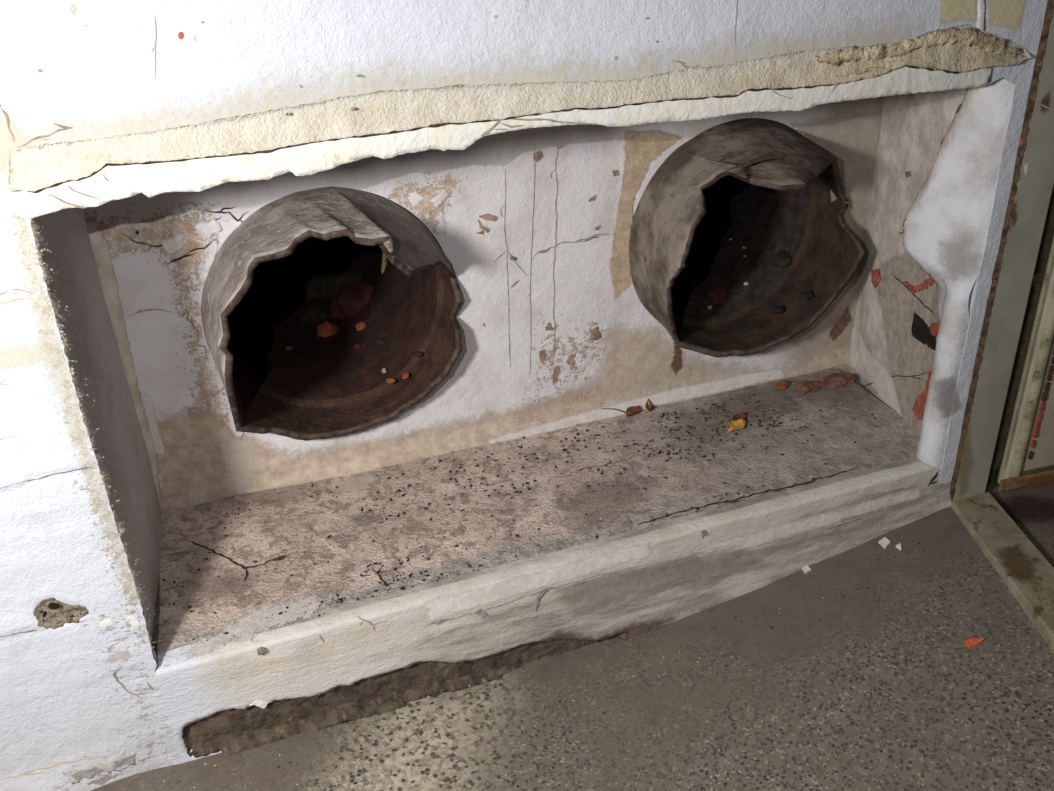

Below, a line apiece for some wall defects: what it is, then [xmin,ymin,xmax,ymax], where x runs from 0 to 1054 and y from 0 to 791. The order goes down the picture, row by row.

crack [0,107,73,147]
spalling [8,66,993,439]
rust [829,306,852,343]
crack [638,469,853,524]
peeling [33,323,175,791]
crack [186,539,294,581]
peeling [534,587,554,611]
spalling [182,630,636,758]